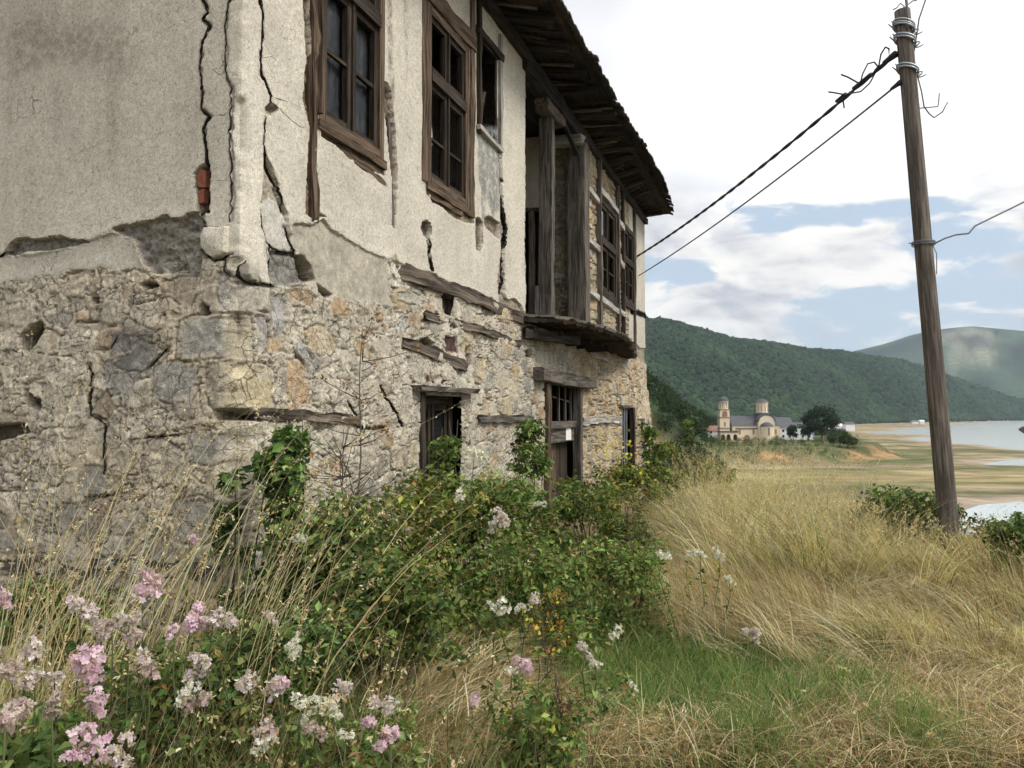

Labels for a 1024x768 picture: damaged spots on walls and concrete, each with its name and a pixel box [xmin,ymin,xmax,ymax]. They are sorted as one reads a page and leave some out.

crack [199,0,233,226]
crack [207,0,316,288]
spalling [302,0,311,117]
spalling [3,234,90,256]
spalling [112,163,212,278]
peeling [260,157,438,306]
crack [426,239,434,272]
spalling [432,202,525,313]
crack [492,127,508,294]
crack [84,365,122,498]
crack [324,368,403,429]